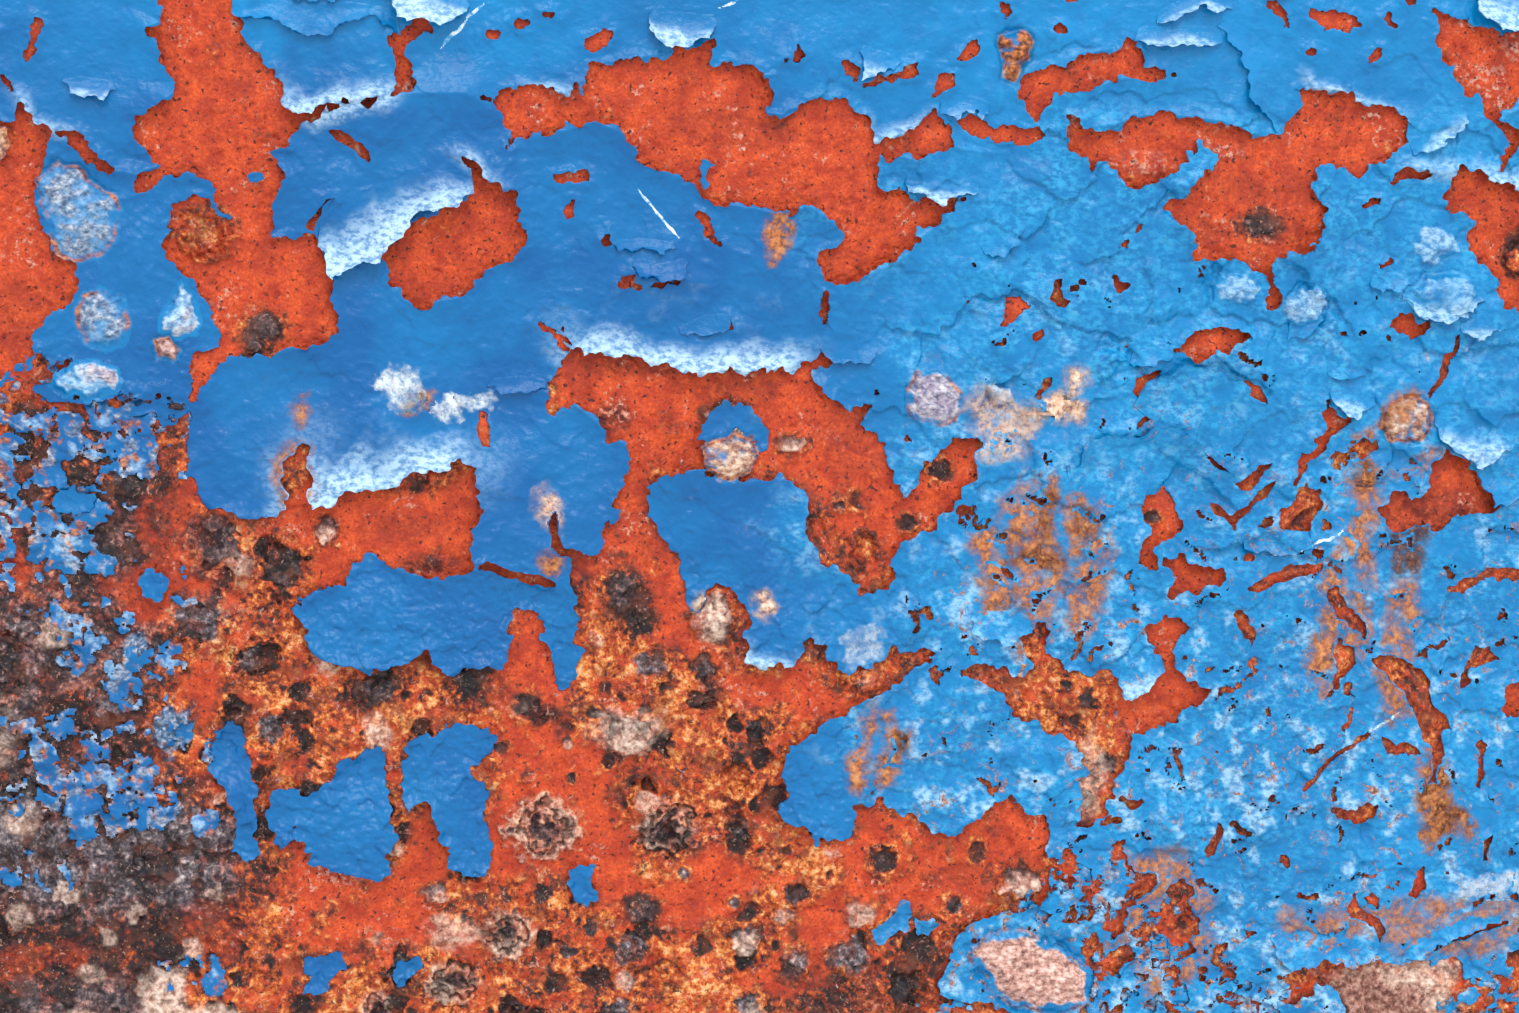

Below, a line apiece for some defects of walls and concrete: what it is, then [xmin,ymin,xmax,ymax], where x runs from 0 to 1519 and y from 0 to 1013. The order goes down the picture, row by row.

rust [485,12,554,39]
rust [1053,23,1067,34]
rust [819,290,829,319]
peeling [0,0,1519,737]
crack [1128,370,1160,430]
crack [1195,456,1275,531]
crack [1248,557,1328,592]
rust [0,352,1519,1013]
crack [1325,638,1499,783]
peeling [169,578,770,996]
crack [1302,732,1370,792]
peeling [750,783,1050,1002]